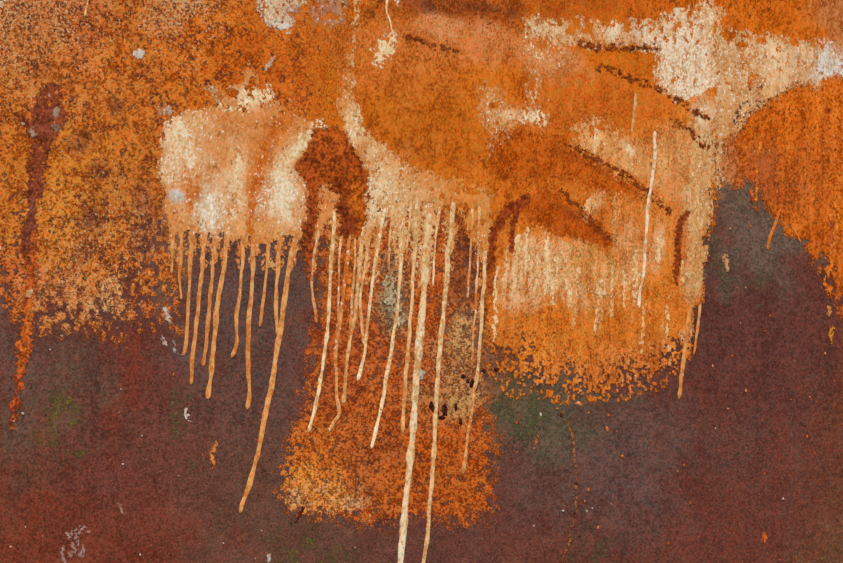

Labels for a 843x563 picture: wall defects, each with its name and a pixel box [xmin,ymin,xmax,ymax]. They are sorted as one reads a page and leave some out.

corrosion [408,189,504,531]
corrosion [672,210,690,286]
corrosion [669,115,710,150]
corrosion [702,53,843,325]